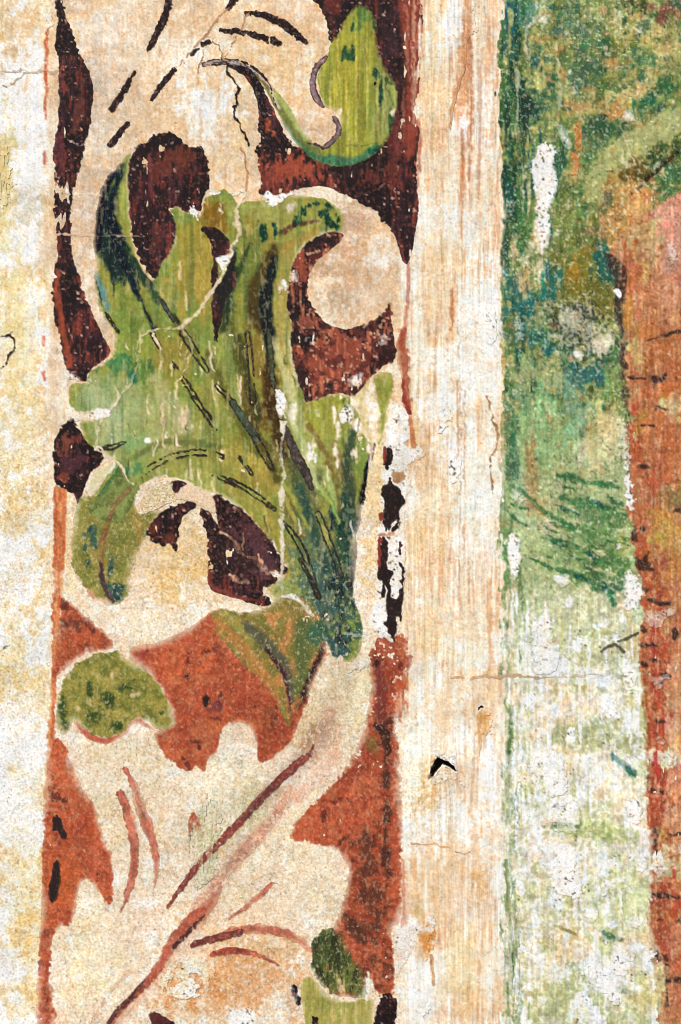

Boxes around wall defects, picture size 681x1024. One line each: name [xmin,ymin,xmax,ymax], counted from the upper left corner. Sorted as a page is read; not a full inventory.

crack [95,7,250,485]
peeling [530,124,572,255]
spalling [342,327,426,643]